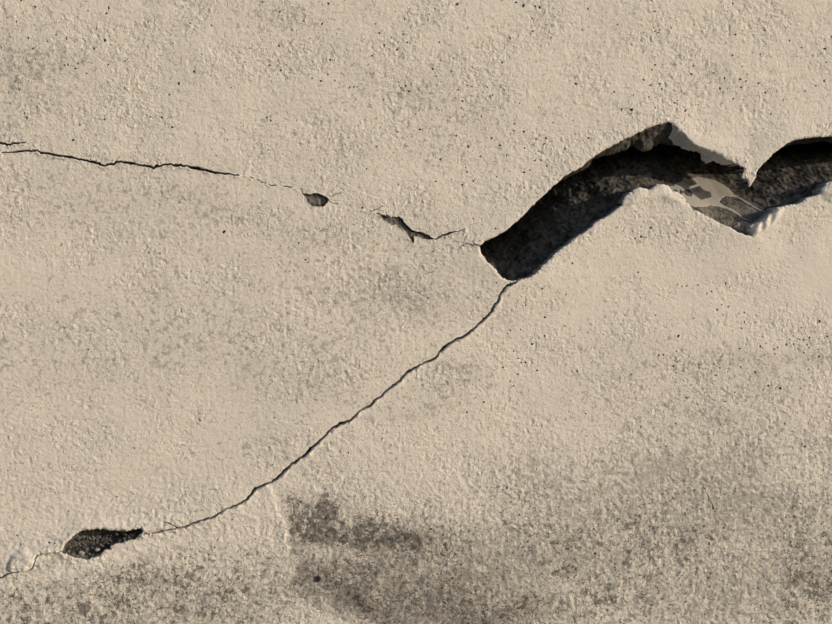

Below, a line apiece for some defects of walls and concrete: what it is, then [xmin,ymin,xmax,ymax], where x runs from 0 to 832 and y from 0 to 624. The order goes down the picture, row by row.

crack [0,141,303,197]
flaking render [479,122,832,284]
crack [434,229,480,247]
crack [142,279,523,538]
crack [0,550,62,579]
flaking render [57,524,146,564]
leakage [281,491,459,559]
leakage [315,576,378,623]